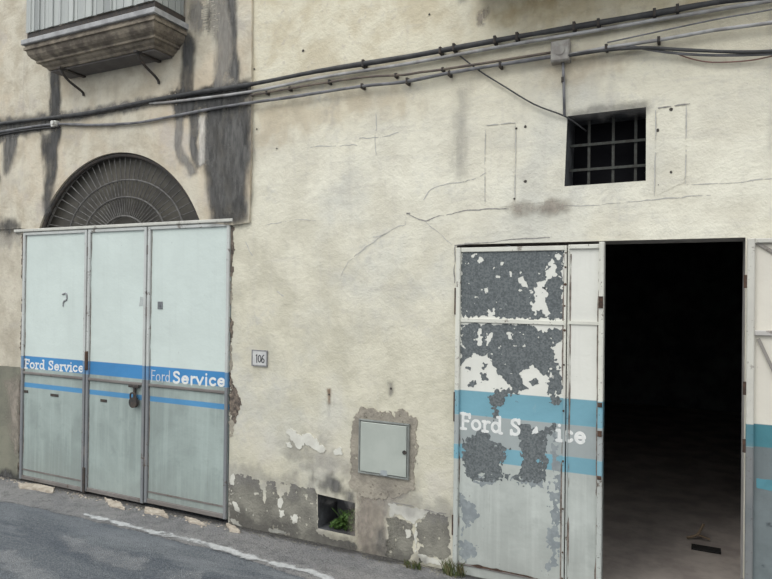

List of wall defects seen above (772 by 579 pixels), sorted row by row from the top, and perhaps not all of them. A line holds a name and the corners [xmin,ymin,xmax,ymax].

damp [0,0,251,223]
damp [0,219,17,232]
crack [339,122,550,283]
damp [514,201,564,213]
spalling [228,318,242,437]
peeling [228,473,357,551]
peeling [286,406,480,565]